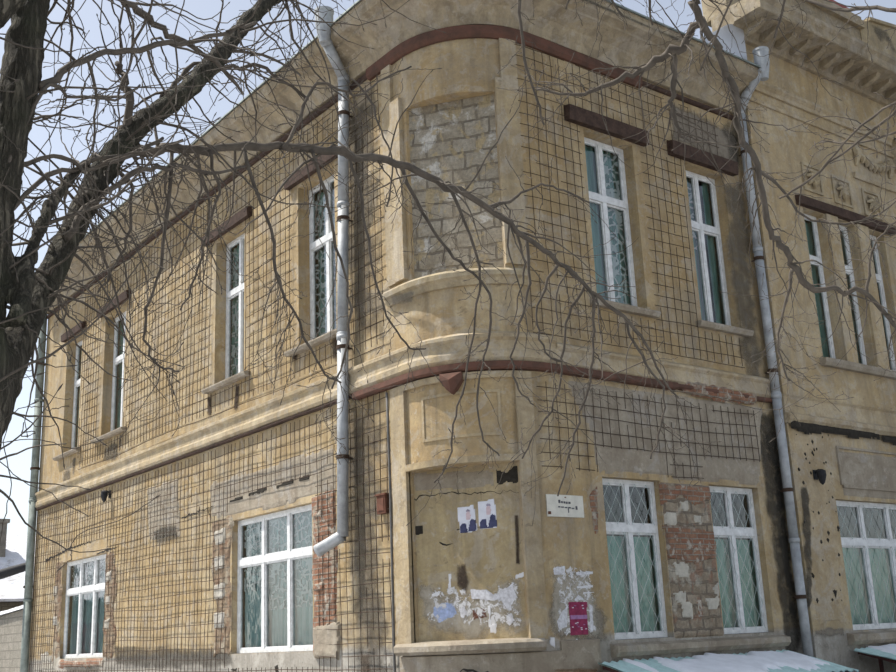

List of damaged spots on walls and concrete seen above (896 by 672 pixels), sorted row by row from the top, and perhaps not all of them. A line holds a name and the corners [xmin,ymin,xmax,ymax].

spalling [682,382,757,405]
flaking render [211,515,234,658]
flaking render [312,489,338,628]
water stain [349,413,387,672]
flaking render [658,482,723,638]